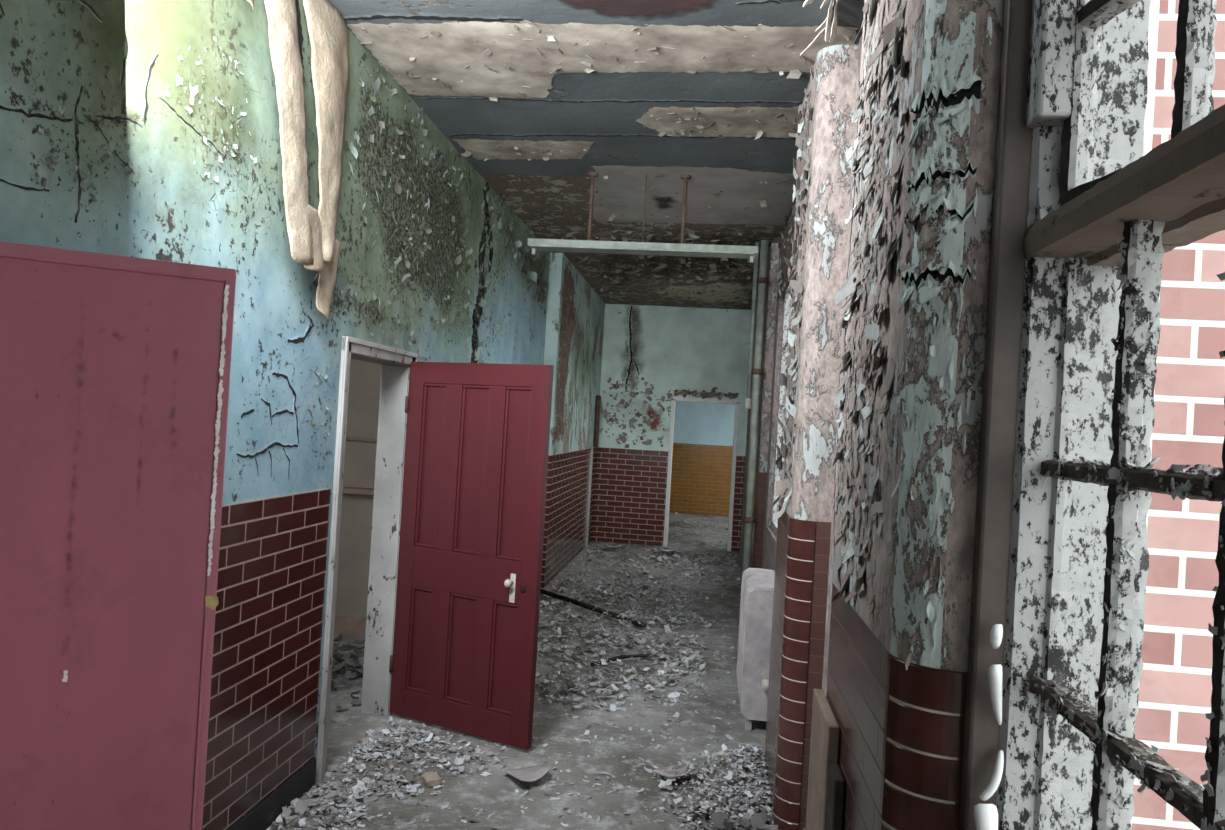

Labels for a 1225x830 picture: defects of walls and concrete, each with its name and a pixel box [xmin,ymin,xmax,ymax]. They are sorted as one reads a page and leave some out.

crack [0,0,226,224]
damp [72,0,226,141]
peeling [207,285,229,576]
crack [236,313,316,480]
crack [465,178,497,363]
peeling [247,0,988,670]
damp [560,0,714,18]
crack [898,65,982,314]
peeling [973,13,992,59]
peeling [1111,233,1154,395]
peeling [1042,411,1225,506]
peeling [1034,539,1225,830]